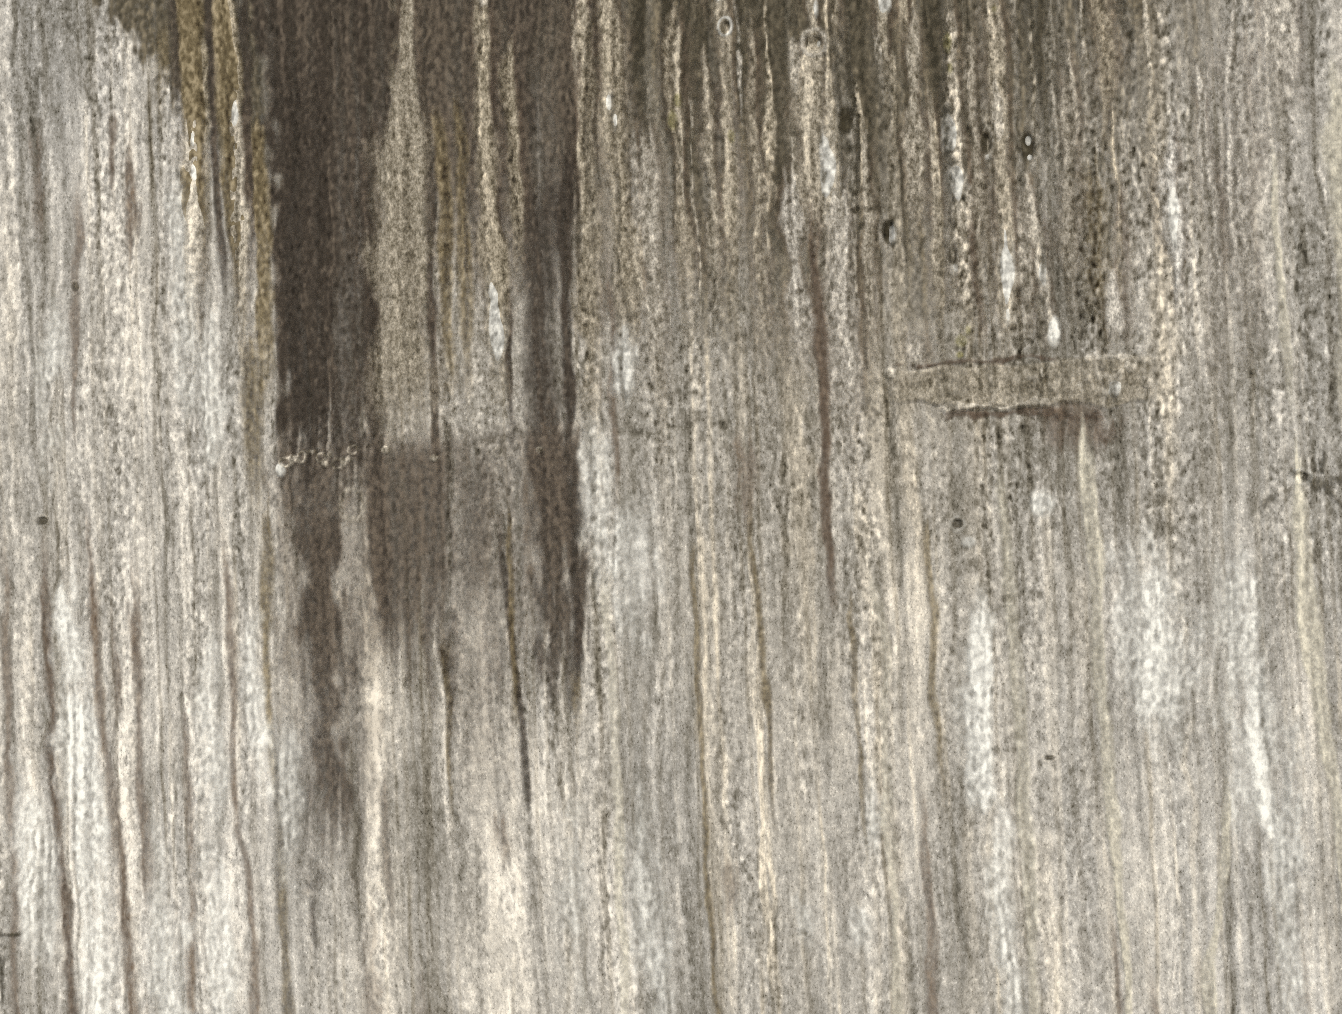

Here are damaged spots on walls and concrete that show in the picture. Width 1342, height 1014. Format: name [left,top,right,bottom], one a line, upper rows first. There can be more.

leakage [173,120,202,295]
efflorescence [231,101,248,278]
leakage [662,0,1059,582]
leakage [1060,54,1074,254]
efflorescence [1107,274,1122,332]
efflorescence [1159,141,1183,289]
leakage [1197,19,1248,226]
leakage [244,0,663,820]
leakage [200,576,268,810]
leakage [964,619,992,806]
leakage [153,886,232,1014]
leakage [244,854,259,1014]